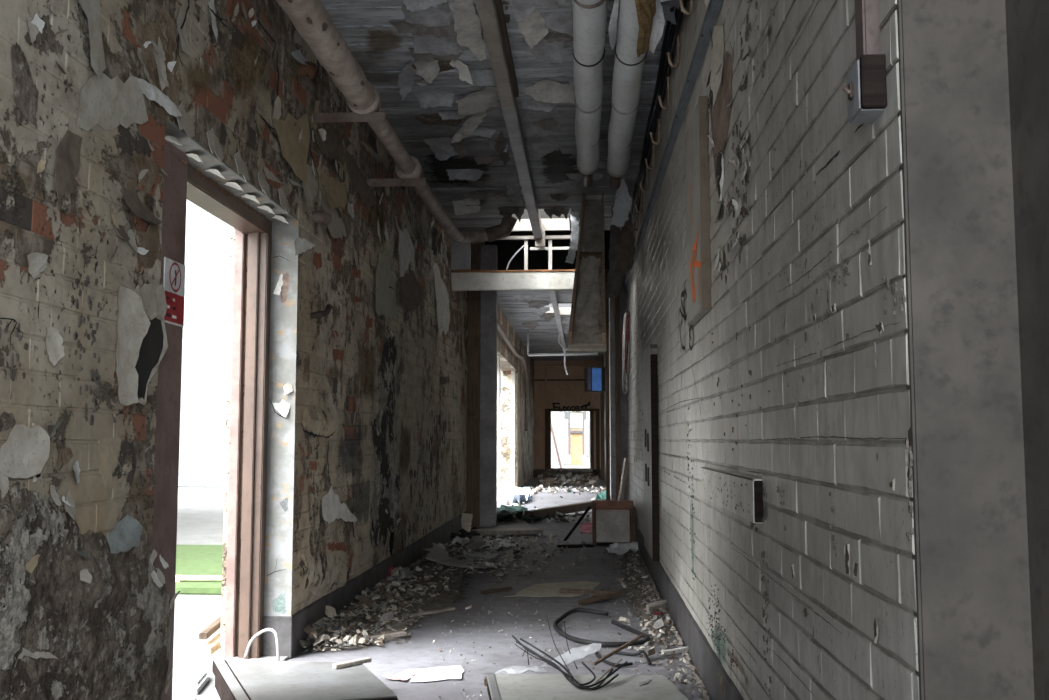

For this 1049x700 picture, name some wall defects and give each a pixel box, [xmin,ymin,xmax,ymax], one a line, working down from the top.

peeling [10,4,68,125]
peeling [389,0,524,223]
peeling [520,79,575,160]
peeling [705,0,765,283]
peeling [26,252,48,279]
peeling [37,0,458,552]
peeling [544,194,570,219]
peeling [0,320,29,381]
peeling [0,412,181,700]